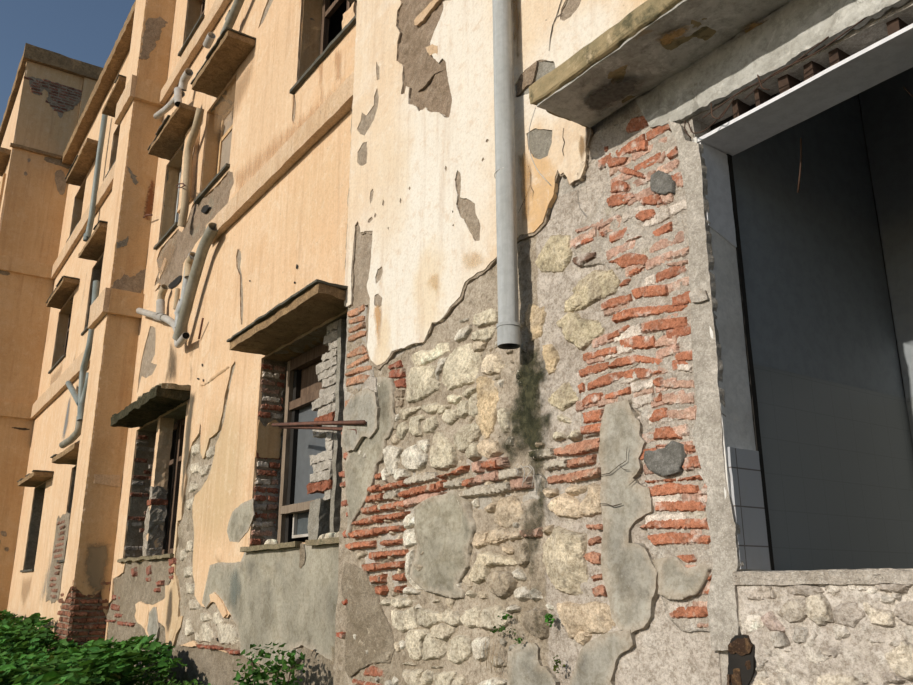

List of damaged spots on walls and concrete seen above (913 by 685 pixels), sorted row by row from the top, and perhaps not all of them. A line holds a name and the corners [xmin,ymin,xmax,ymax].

peeling [561,0,581,21]
peeling [138,17,168,60]
peeling [398,0,452,118]
flaking render [24,76,82,118]
peeling [527,128,552,159]
flaking render [44,134,722,685]
leakage [503,352,550,553]